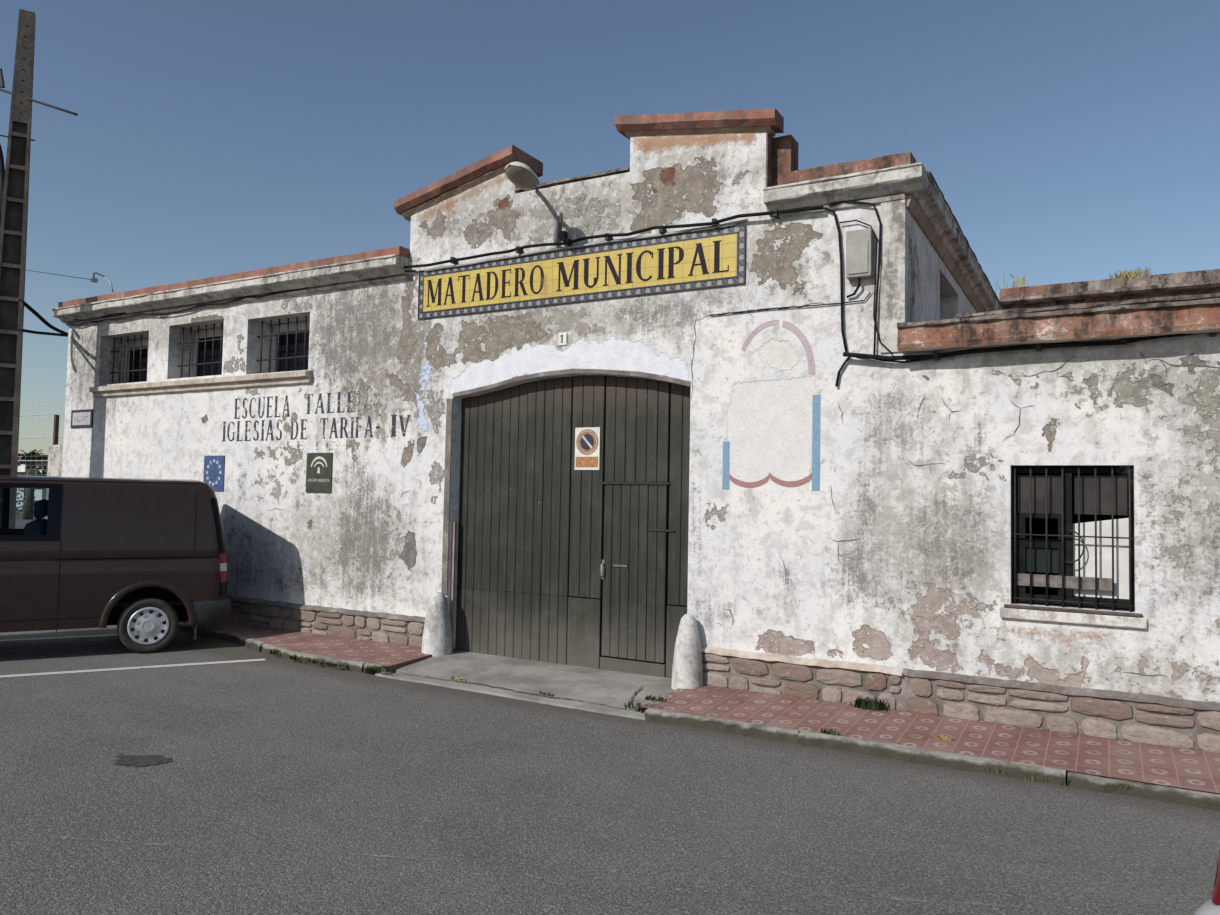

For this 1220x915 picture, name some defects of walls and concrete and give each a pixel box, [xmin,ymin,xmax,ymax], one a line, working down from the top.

peeling [419,209,446,239]
peeling [463,194,520,248]
peeling [629,156,749,234]
peeling [749,217,823,295]
flaking render [399,530,417,570]
peeling [755,624,893,661]
peeling [907,612,963,673]
peeling [978,649,1089,688]